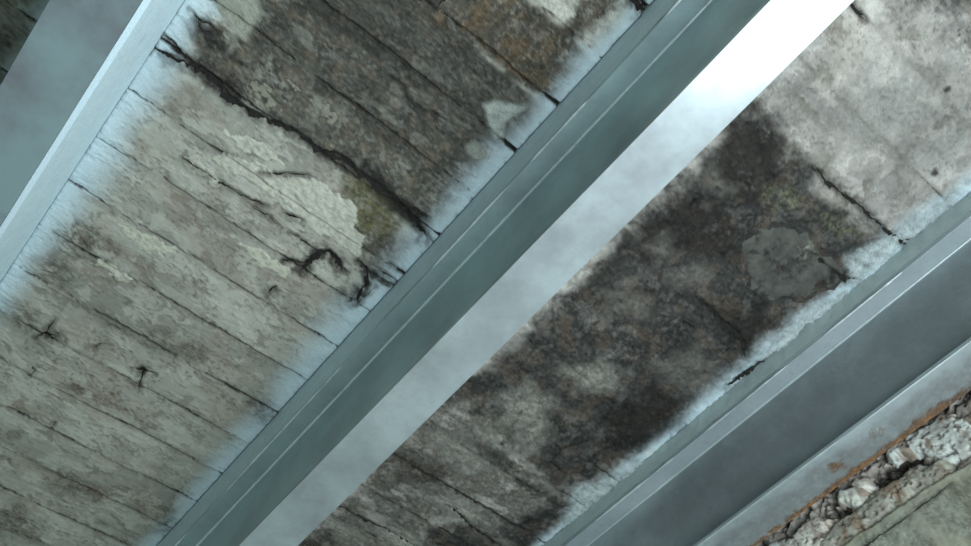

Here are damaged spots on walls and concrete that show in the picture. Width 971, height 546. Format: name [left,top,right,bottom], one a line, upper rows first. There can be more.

crack [194,14,218,33]
crack [154,35,428,240]
crack [184,158,405,303]
crack [812,165,910,245]
crack [136,367,154,389]
water stain [300,102,959,546]
rust [753,389,968,546]